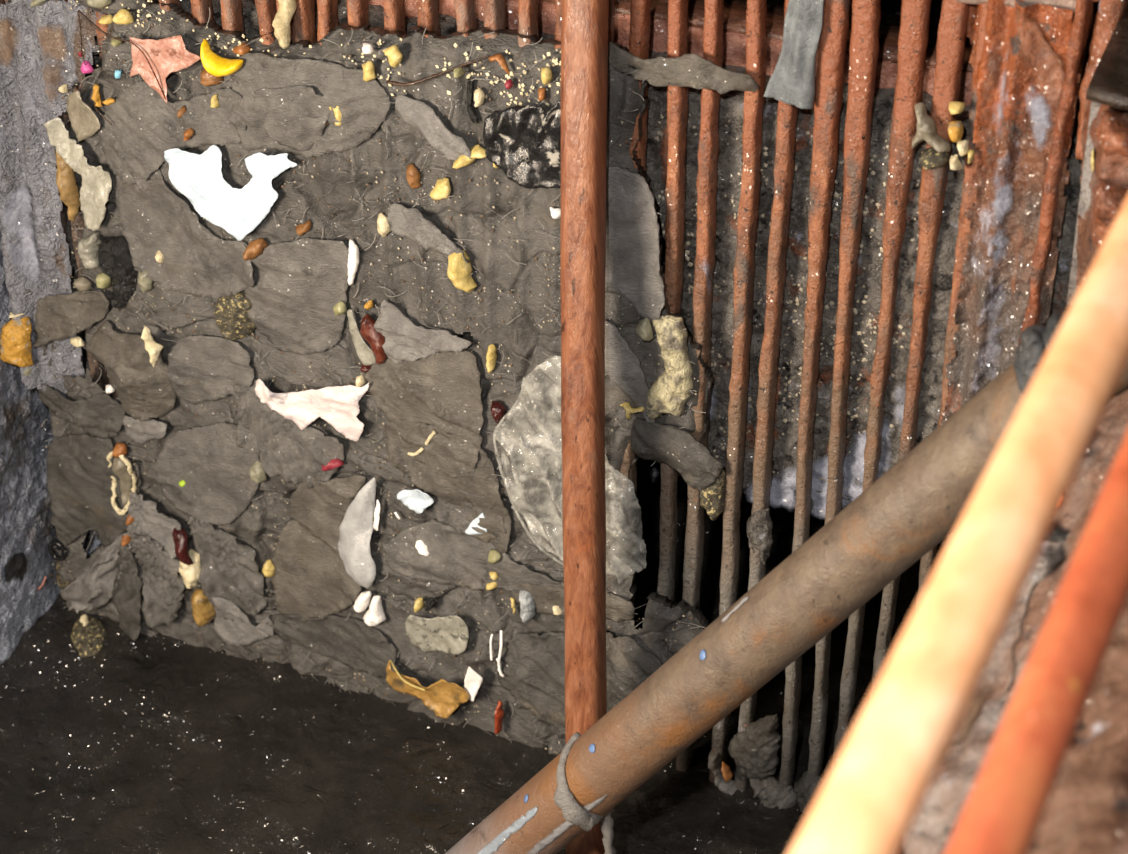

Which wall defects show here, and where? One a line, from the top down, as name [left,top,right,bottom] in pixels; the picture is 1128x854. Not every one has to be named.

corrosion [940,0,1073,425]